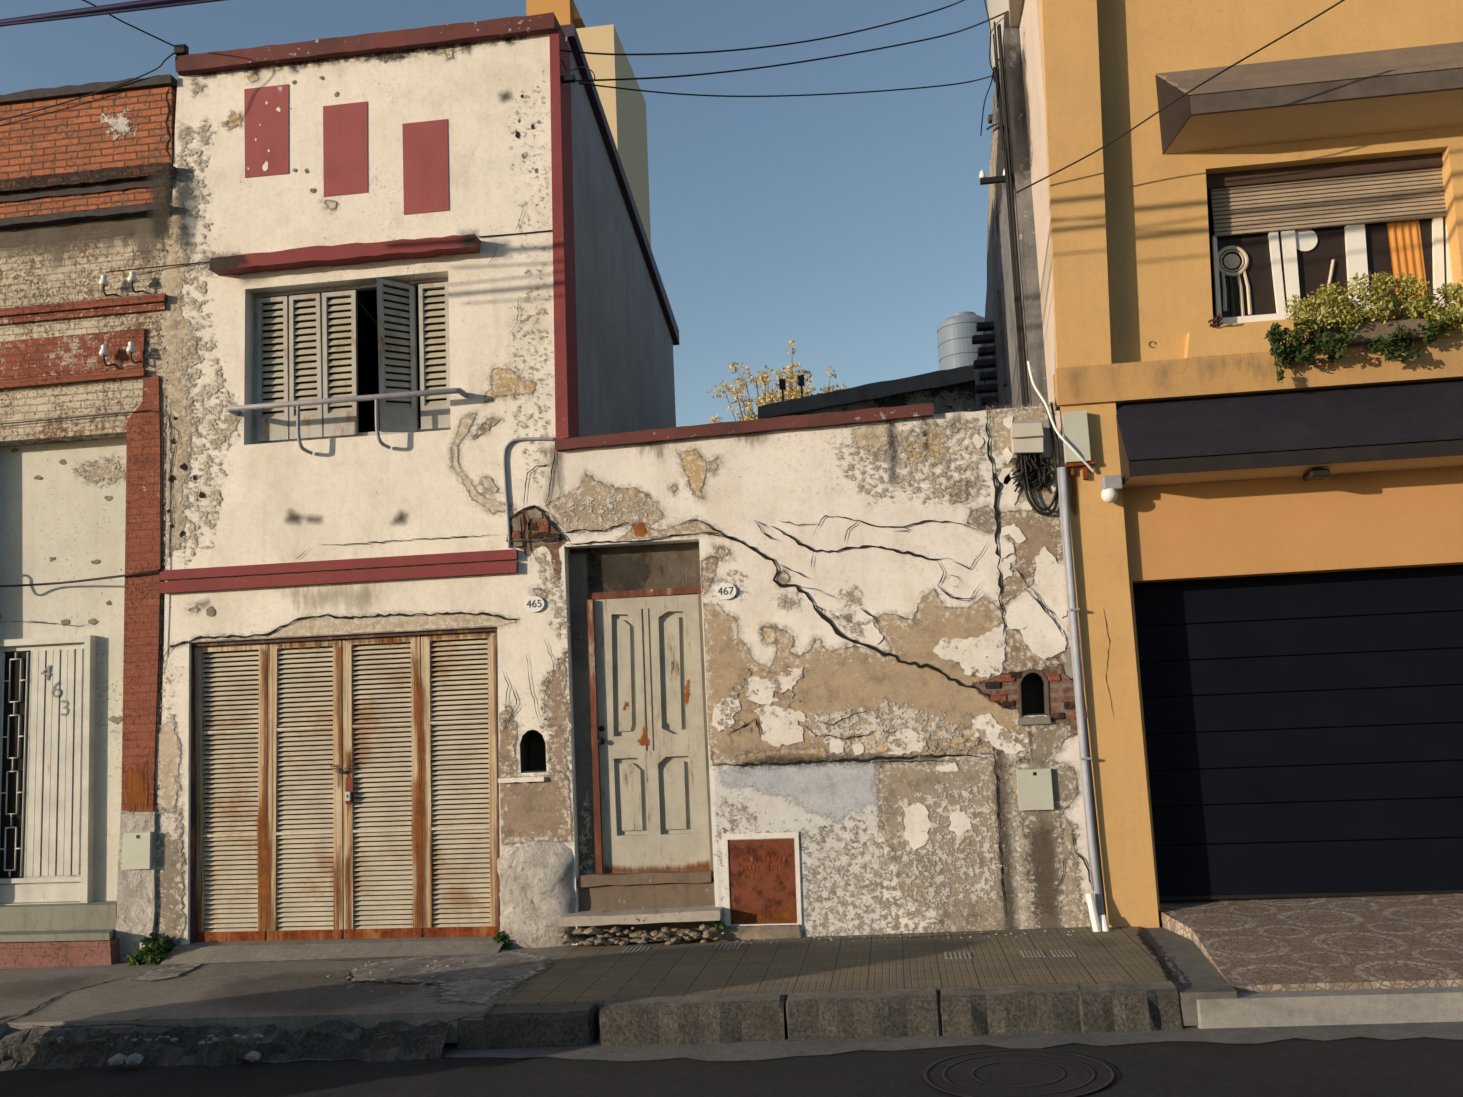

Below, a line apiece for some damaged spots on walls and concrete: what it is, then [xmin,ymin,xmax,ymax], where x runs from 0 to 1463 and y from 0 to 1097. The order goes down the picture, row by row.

peeling [150,111,270,570]
peeling [154,612,516,945]
rust [257,636,426,931]
rust [427,632,496,716]
rust [638,727,650,746]
rust [731,905,794,923]
peeling [450,71,1092,937]
crack [524,411,1114,716]